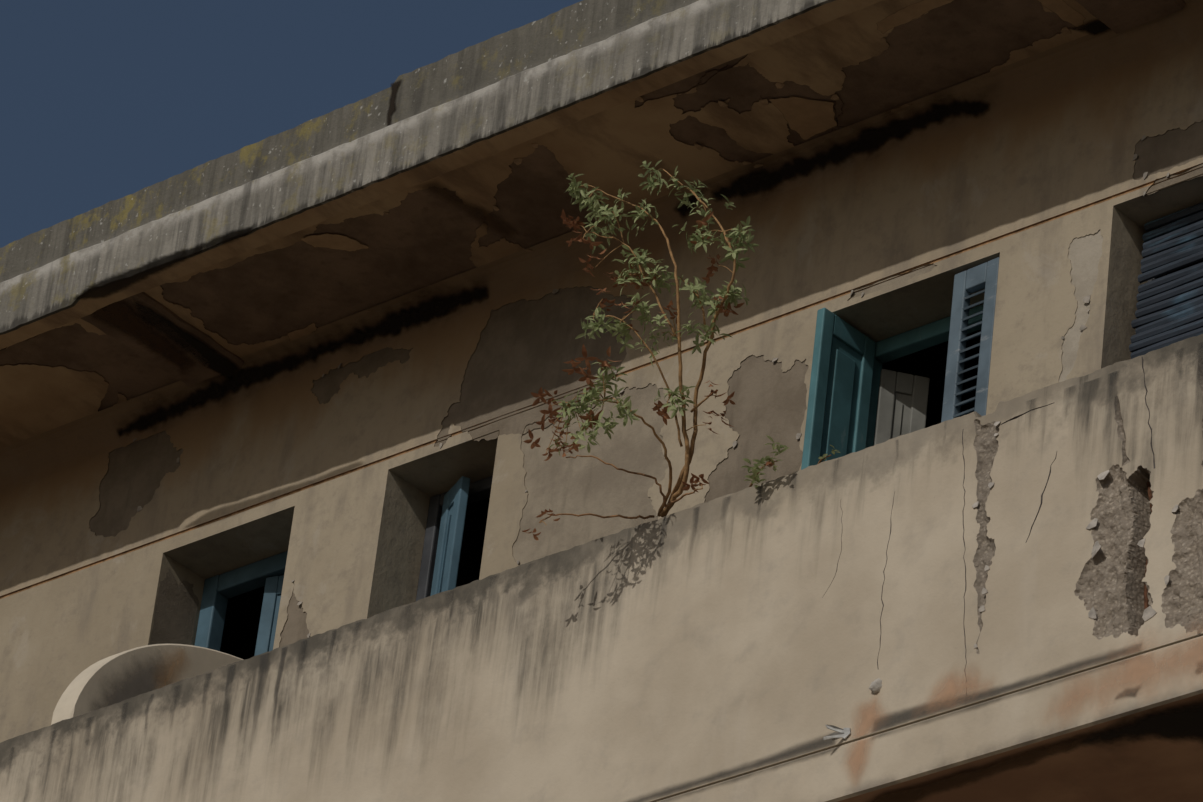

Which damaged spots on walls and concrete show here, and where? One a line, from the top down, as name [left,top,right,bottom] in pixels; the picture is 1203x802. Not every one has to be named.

damp [675,101,989,217]
peeling [634,0,1078,169]
peeling [1133,120,1203,197]
peeling [160,143,604,345]
peeling [89,431,184,537]
damp [74,227,488,436]
peeling [704,355,808,502]
crack [877,492,895,669]
crack [962,402,1057,695]
crack [1114,357,1155,468]
spalling [1074,464,1203,639]
crack [1195,357,1203,467]